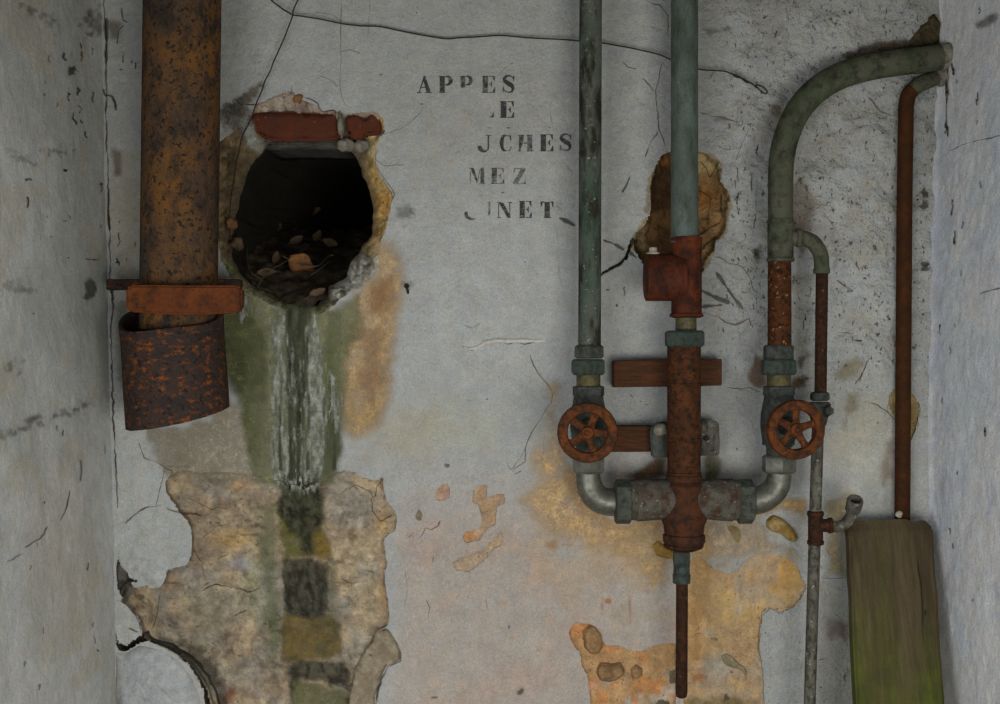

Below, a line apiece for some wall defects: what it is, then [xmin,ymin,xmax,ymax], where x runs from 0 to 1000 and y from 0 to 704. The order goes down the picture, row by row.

crack [624,63,665,158]
hole [219,91,393,314]
flaking render [603,152,671,264]
flaking render [698,152,743,309]
leakage [240,293,252,323]
rust [342,244,402,437]
crack [116,596,220,704]
leakage [147,308,342,644]
flaking render [116,470,401,704]
mould [289,661,349,701]
peeling [453,485,505,572]
peeling [569,553,806,704]